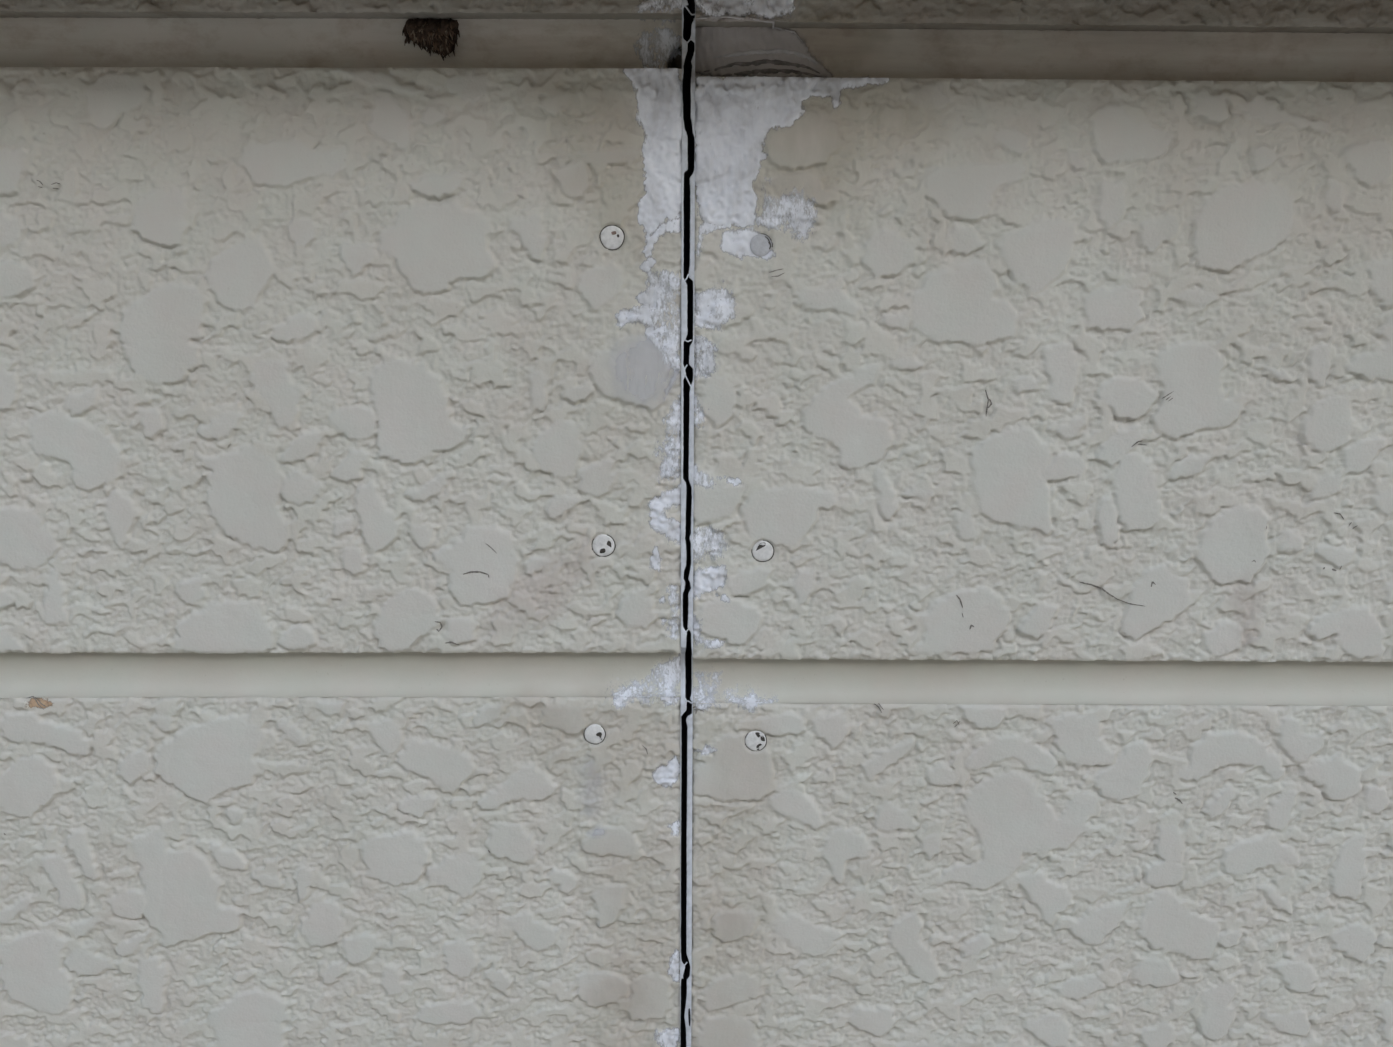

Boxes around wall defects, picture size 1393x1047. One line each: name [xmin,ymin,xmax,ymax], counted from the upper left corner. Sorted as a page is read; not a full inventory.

crack [680,0,695,1047]